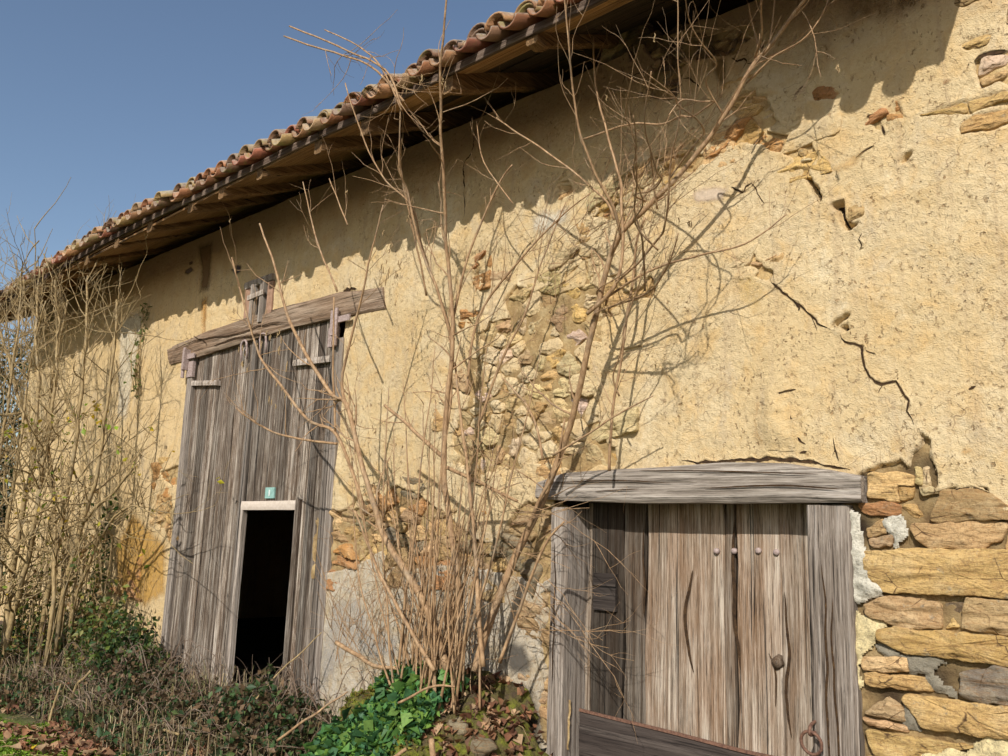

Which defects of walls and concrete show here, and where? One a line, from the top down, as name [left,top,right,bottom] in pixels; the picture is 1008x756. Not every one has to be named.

spalling [865,100,903,130]
spalling [920,34,1008,134]
spalling [326,71,842,744]
crack [770,276,914,424]
spalling [311,518,319,579]
spalling [842,439,1008,756]